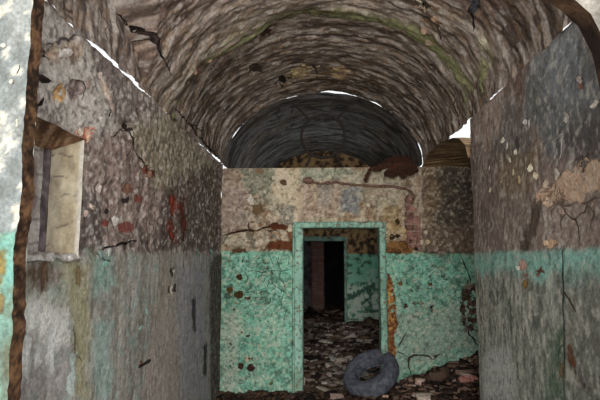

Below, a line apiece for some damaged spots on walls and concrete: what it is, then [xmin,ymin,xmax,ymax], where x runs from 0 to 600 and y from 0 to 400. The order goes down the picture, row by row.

crack [99,7,171,77]
water stain [207,8,492,109]
spalling [53,79,91,108]
crack [176,22,463,163]
crack [111,121,144,164]
spalling [7,0,80,400]
crack [102,240,137,250]
rust [165,193,187,241]
crack [222,222,288,241]
peeling [527,155,600,216]
spalling [460,283,477,332]
crack [557,247,576,400]